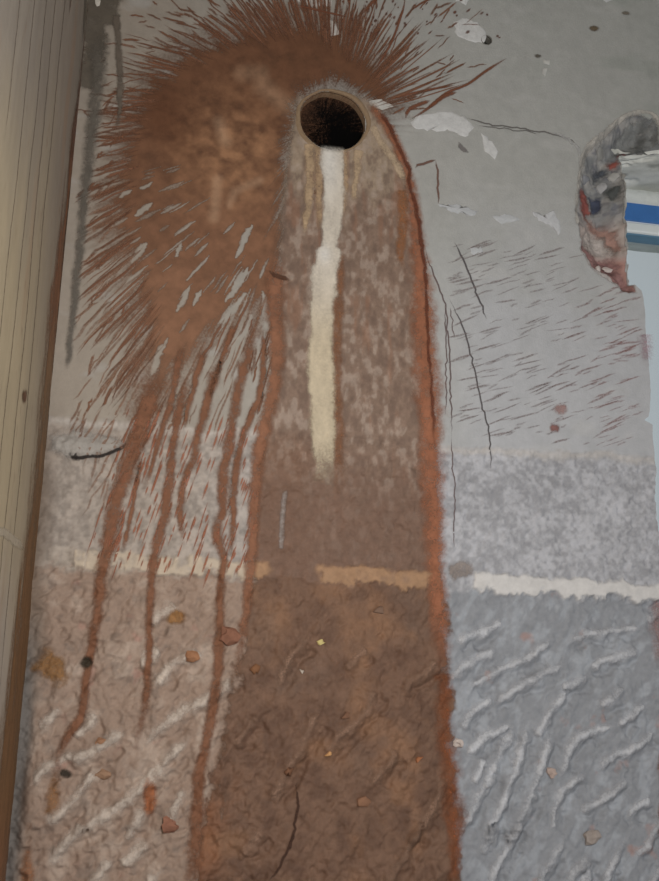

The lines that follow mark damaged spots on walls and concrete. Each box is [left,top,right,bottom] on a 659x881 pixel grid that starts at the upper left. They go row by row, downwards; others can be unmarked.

peeling [454,18,486,43]
crack [433,164,441,202]
peeling [411,111,498,159]
spalling [575,110,659,293]
damp [303,144,363,468]
corrosion [0,0,502,881]
crack [427,257,456,542]